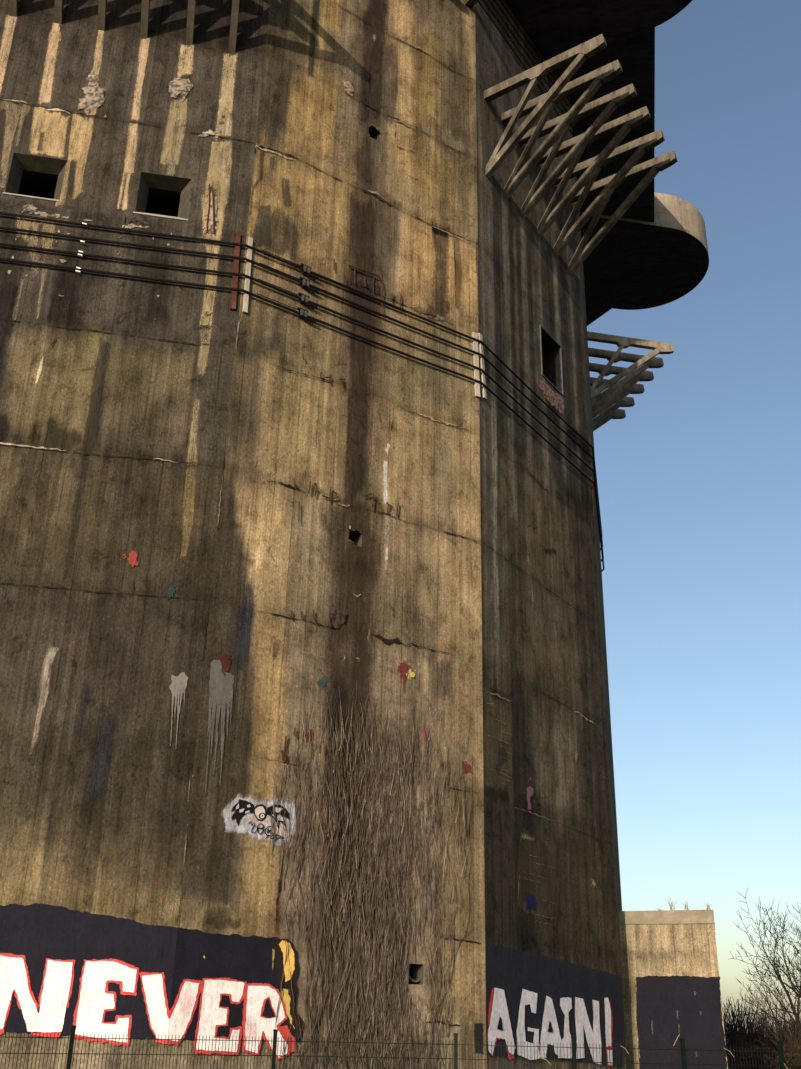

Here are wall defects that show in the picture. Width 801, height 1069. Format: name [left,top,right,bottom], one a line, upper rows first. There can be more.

spalling [77,74,106,113]
spalling [168,74,193,101]
water stain [308,0,319,76]
water stain [361,0,397,122]
water stain [321,196,397,840]
crack [367,631,456,656]